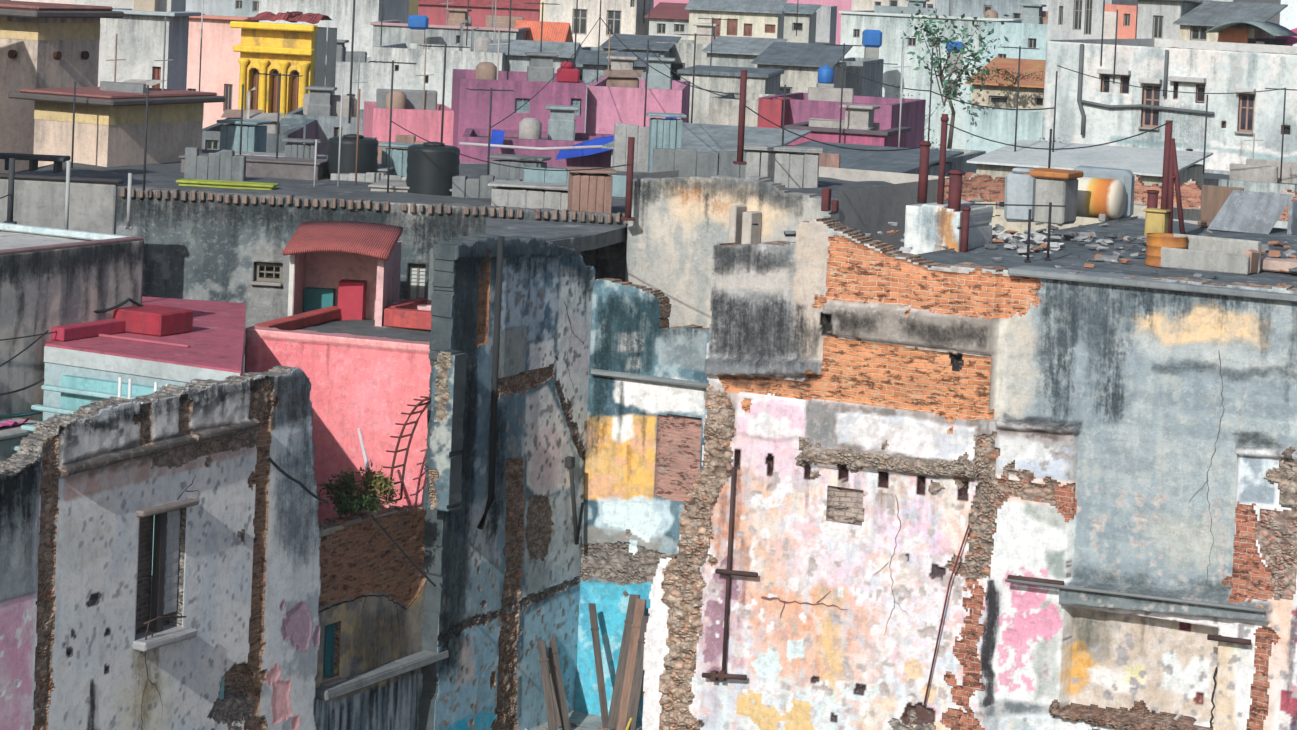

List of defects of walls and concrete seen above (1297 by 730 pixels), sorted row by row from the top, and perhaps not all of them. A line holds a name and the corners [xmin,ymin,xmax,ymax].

water stain [0,242,143,314]
flaking render [812,235,1043,319]
water stain [58,373,320,559]
water stain [117,191,601,679]
water stain [585,292,693,458]
flaking render [712,335,994,434]
flaking render [928,436,1097,526]
water stain [1004,279,1241,431]
crack [1190,350,1224,583]
flaking render [280,508,426,652]
peeling [737,614,986,730]
flaking render [1175,498,1297,730]